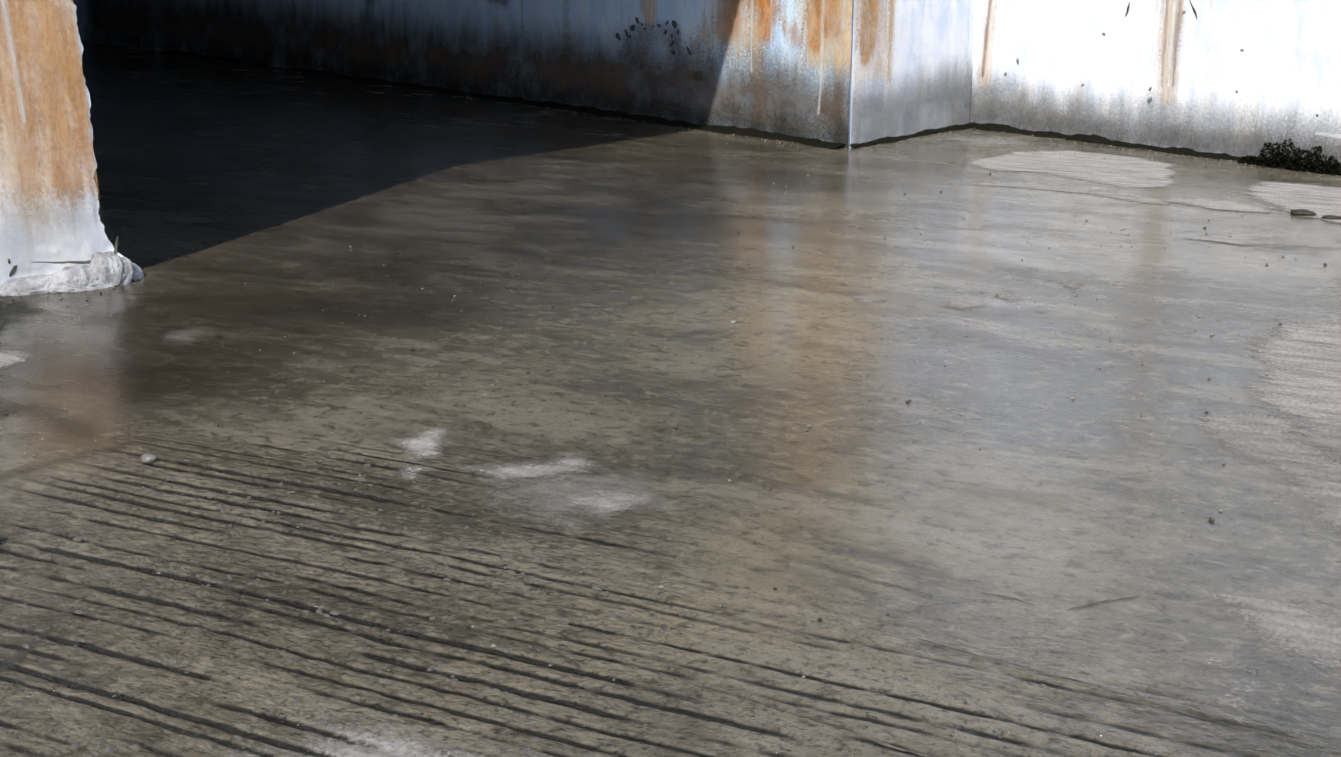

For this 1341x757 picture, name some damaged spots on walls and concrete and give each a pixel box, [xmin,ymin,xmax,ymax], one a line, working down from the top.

corrosion [702,0,780,70]
corrosion [802,0,880,73]
crack [887,0,895,75]
corrosion [0,0,90,195]
leakage [87,0,1341,165]